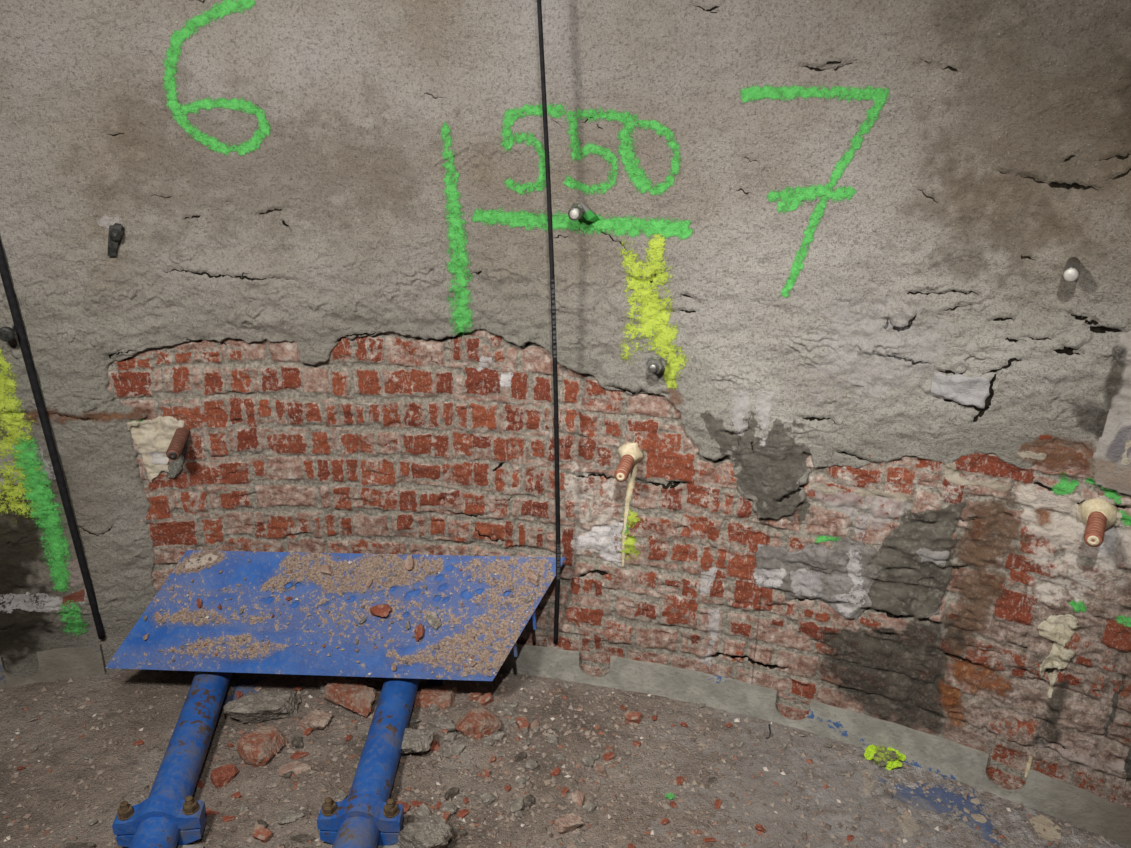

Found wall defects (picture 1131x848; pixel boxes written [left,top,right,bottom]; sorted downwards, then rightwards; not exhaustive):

crack [998,153,1131,190]
crack [164,269,294,281]
crack [869,290,1122,422]
peeling [0,444,56,493]
water stain [0,515,52,664]
spalling [108,329,1131,809]
water stain [1032,675,1131,785]